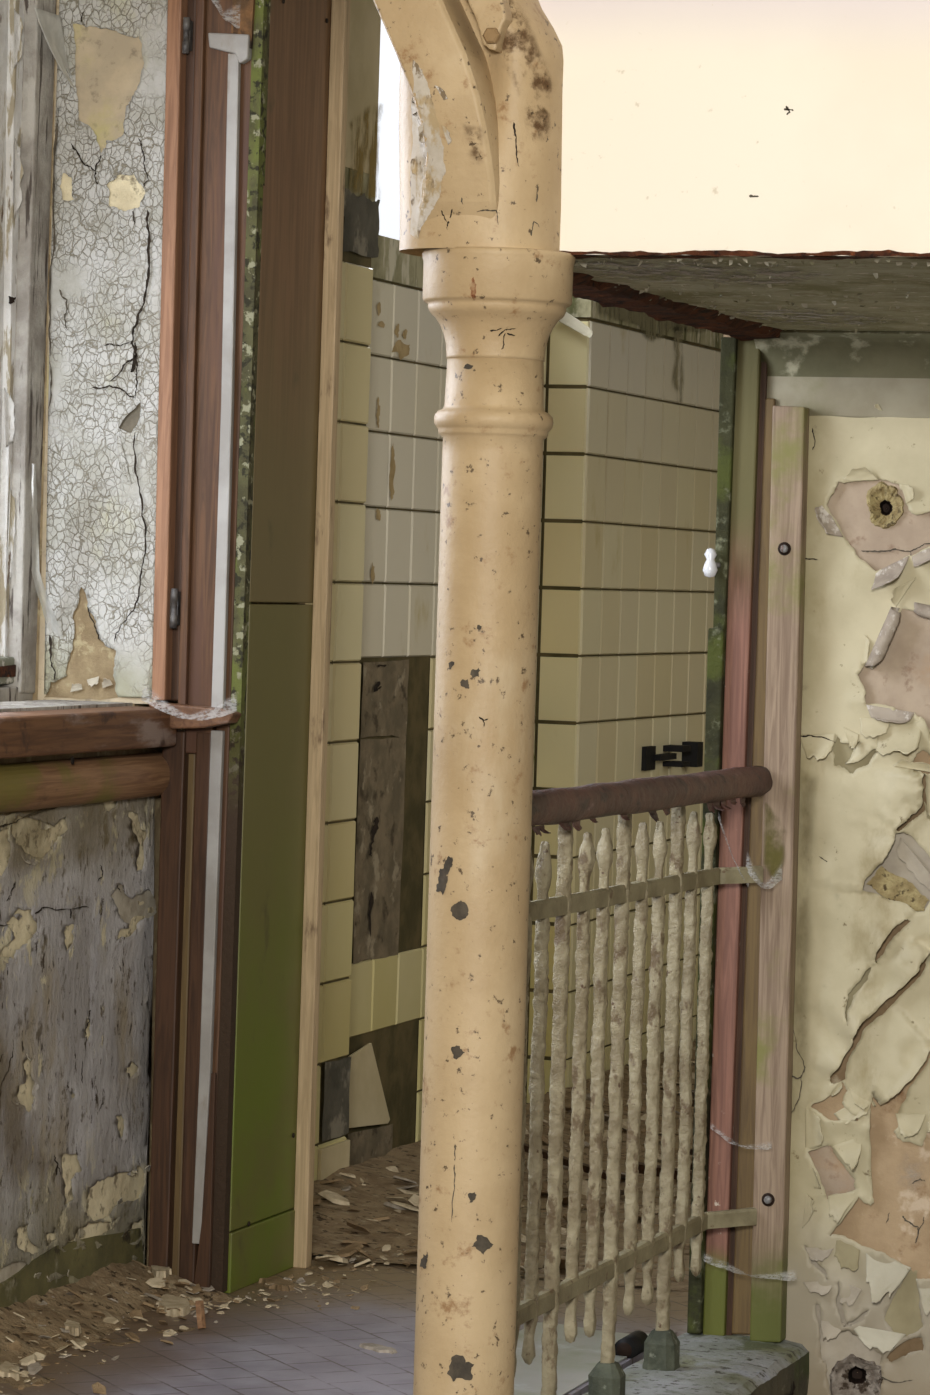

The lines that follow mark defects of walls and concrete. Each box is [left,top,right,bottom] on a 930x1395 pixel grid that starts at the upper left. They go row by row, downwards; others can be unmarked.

spalling [73,24,144,152]
crack [48,124,101,409]
crack [92,138,151,399]
rust [561,250,930,261]
crack [87,434,147,642]
spalling [45,587,118,700]
crack [0,807,57,827]
spalling [0,809,68,876]
crack [0,865,121,926]
peeling [801,467,930,1395]
spalling [348,1043,393,1166]
spalling [0,1153,151,1283]